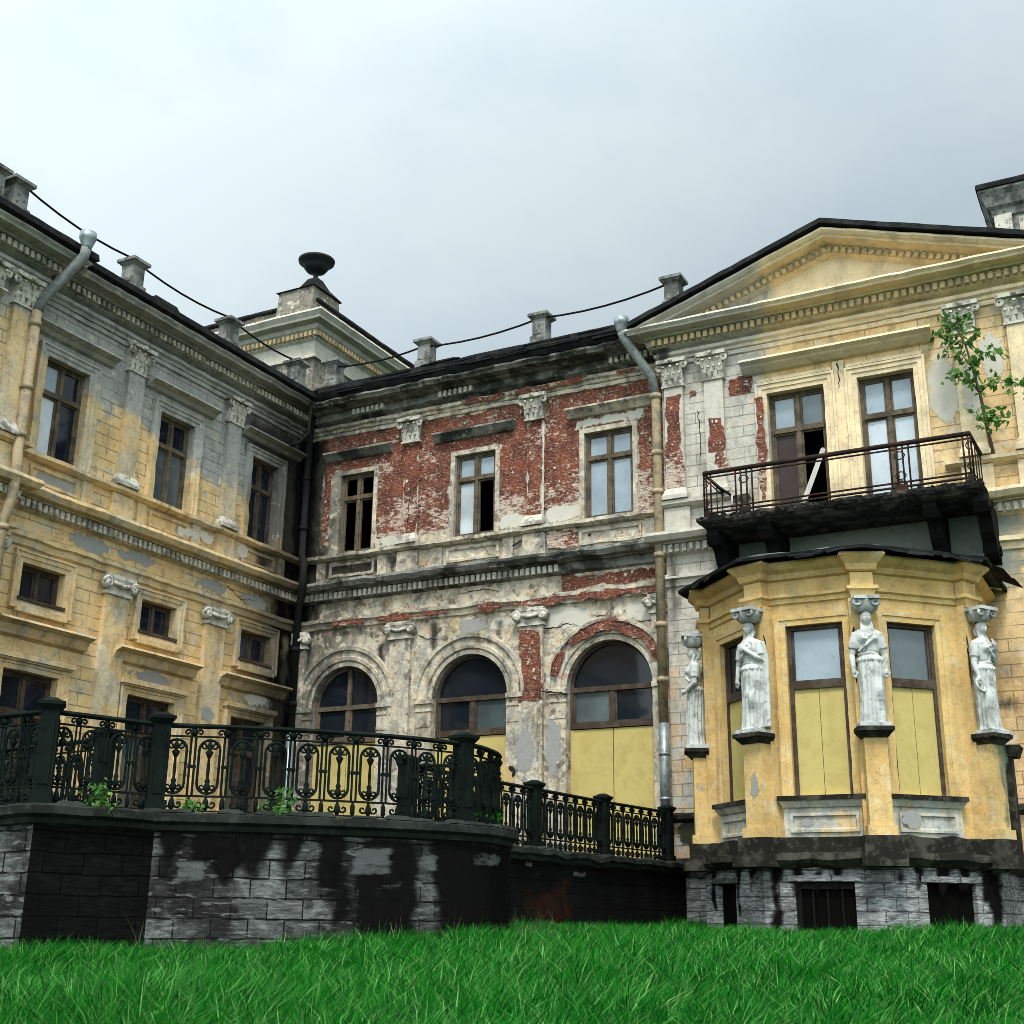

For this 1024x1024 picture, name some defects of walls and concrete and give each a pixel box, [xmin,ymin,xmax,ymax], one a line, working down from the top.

flaking render [927,331,1004,423]
flaking render [319,367,696,549]
flaking render [708,418,728,469]
flaking render [728,376,768,500]
flaking render [62,532,155,568]
flaking render [458,566,667,703]
flaking render [125,670,173,685]
water stain [157,830,511,939]
water stain [736,868,755,915]
water stain [771,868,803,931]
water stain [815,868,842,892]
water stain [914,867,1003,930]